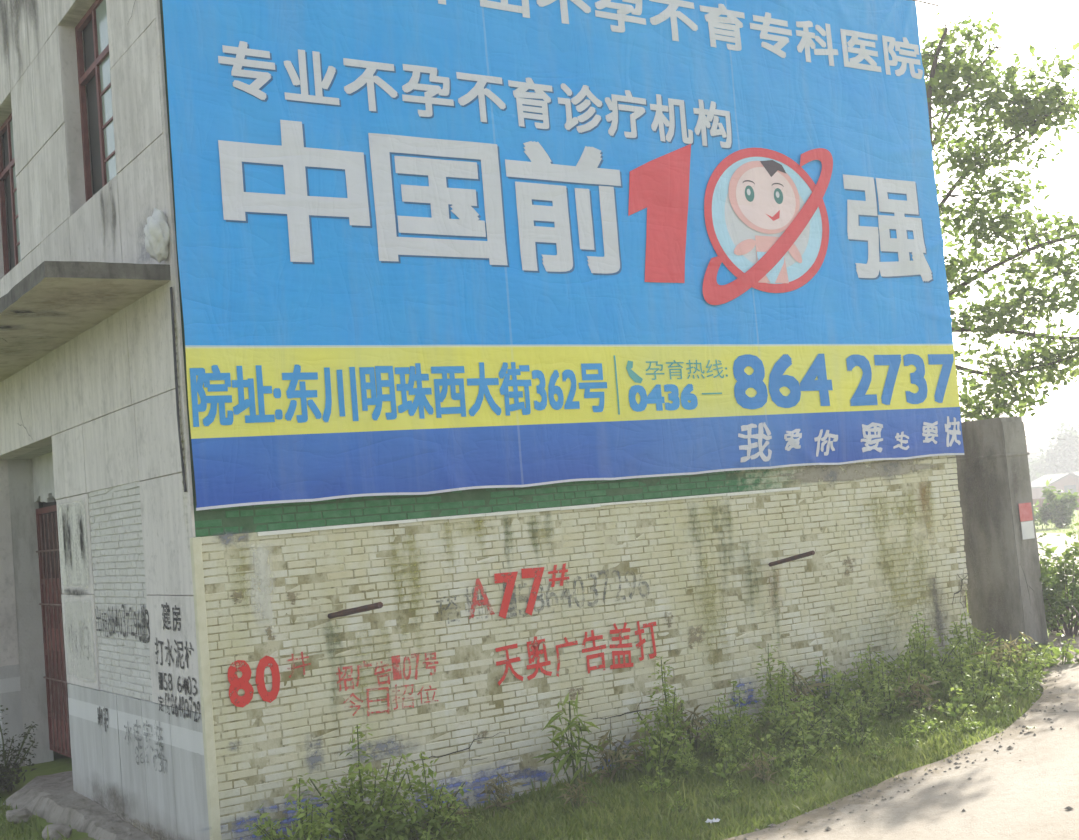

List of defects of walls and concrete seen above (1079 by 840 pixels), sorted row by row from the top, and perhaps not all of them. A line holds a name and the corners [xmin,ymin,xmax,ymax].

damp [63,507,84,550]